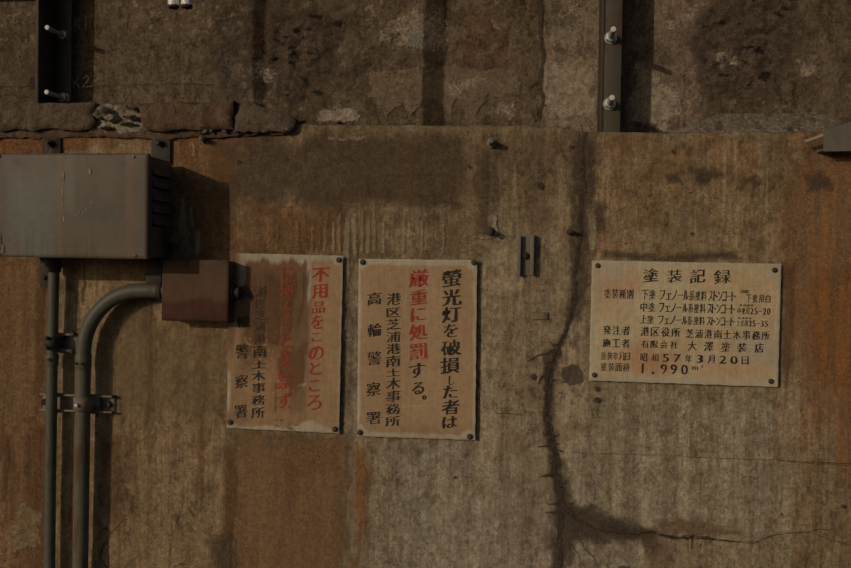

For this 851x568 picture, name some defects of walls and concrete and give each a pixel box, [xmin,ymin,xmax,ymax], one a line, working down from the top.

efflorescence [318,105,360,123]
crack [526,0,549,121]
leakage [569,134,596,317]
crack [527,130,851,568]
leakage [542,349,662,568]